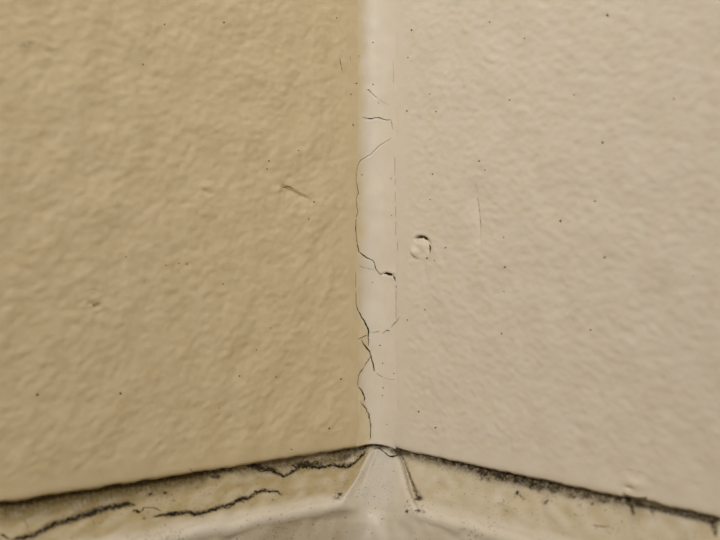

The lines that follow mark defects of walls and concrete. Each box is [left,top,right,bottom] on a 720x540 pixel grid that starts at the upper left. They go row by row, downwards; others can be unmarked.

crack [355,89,397,292]